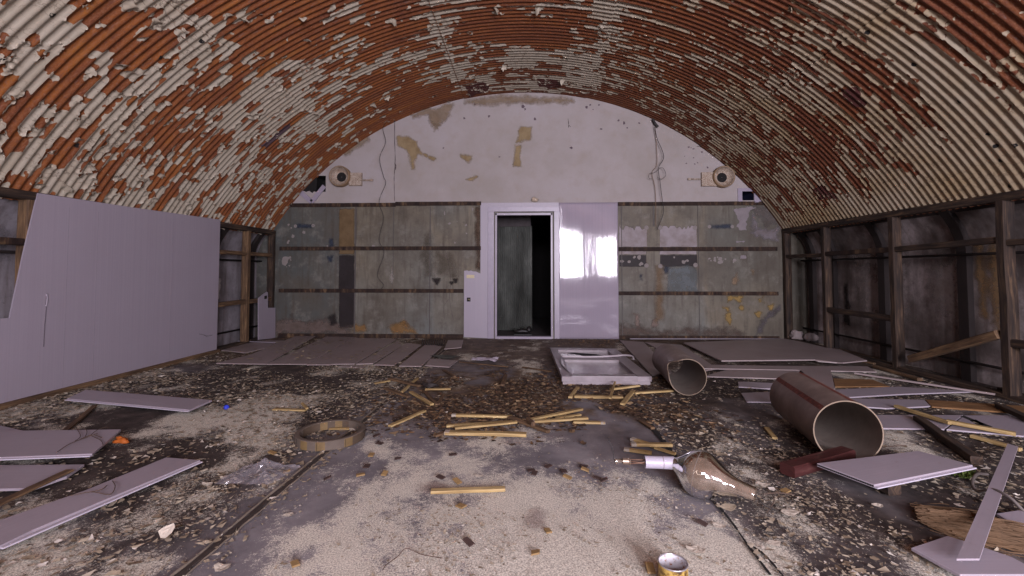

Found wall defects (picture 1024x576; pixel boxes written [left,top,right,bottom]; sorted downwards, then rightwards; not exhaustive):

rust [841,86,867,107]
rust [260,124,291,148]
peeling [0,0,1024,267]